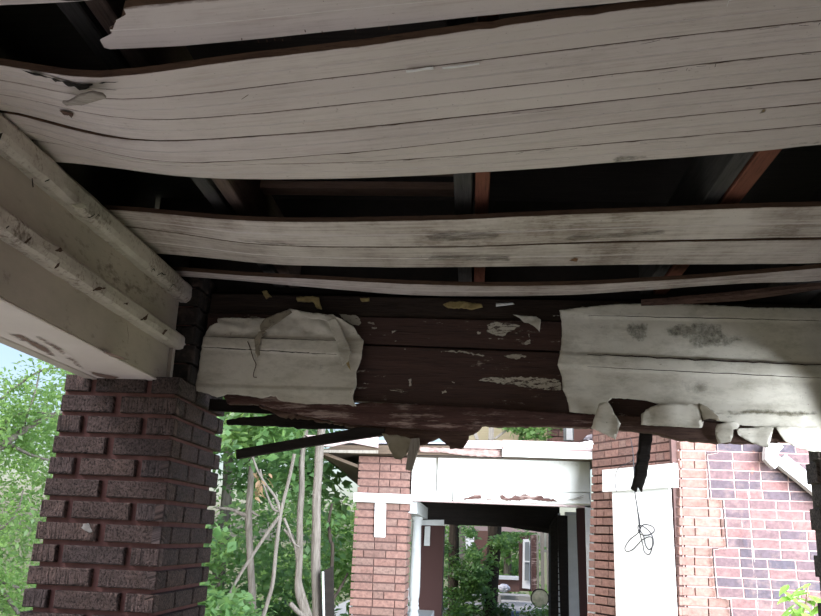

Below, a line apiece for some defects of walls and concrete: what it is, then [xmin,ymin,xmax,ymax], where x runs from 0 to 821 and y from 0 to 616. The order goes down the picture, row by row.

peeling [477,315,541,339]
peeling [479,376,561,390]
peeling [464,494,557,502]